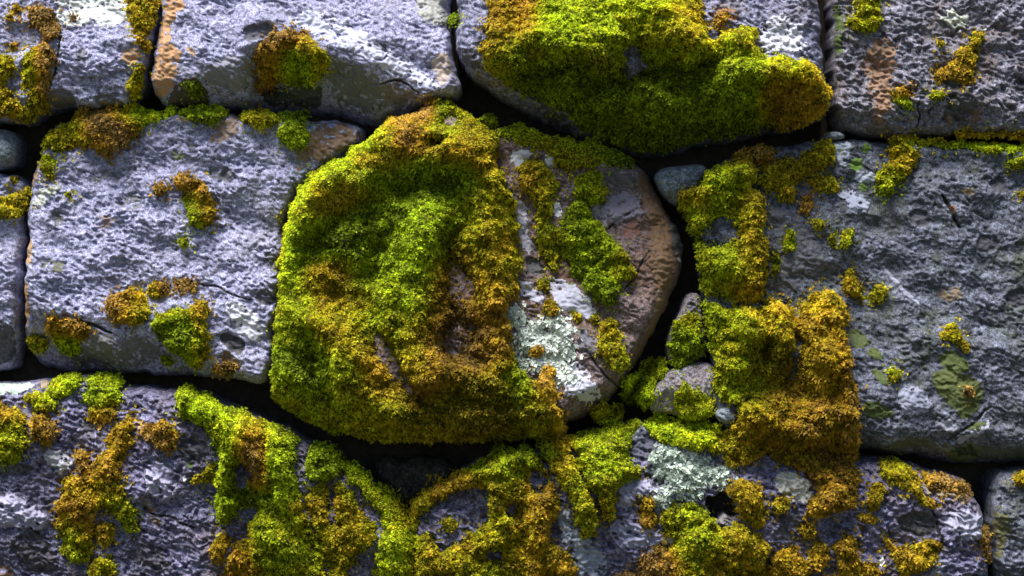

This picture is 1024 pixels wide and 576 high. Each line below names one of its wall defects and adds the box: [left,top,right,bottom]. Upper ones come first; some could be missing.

crack [339,74,420,94]
crack [197,282,252,300]